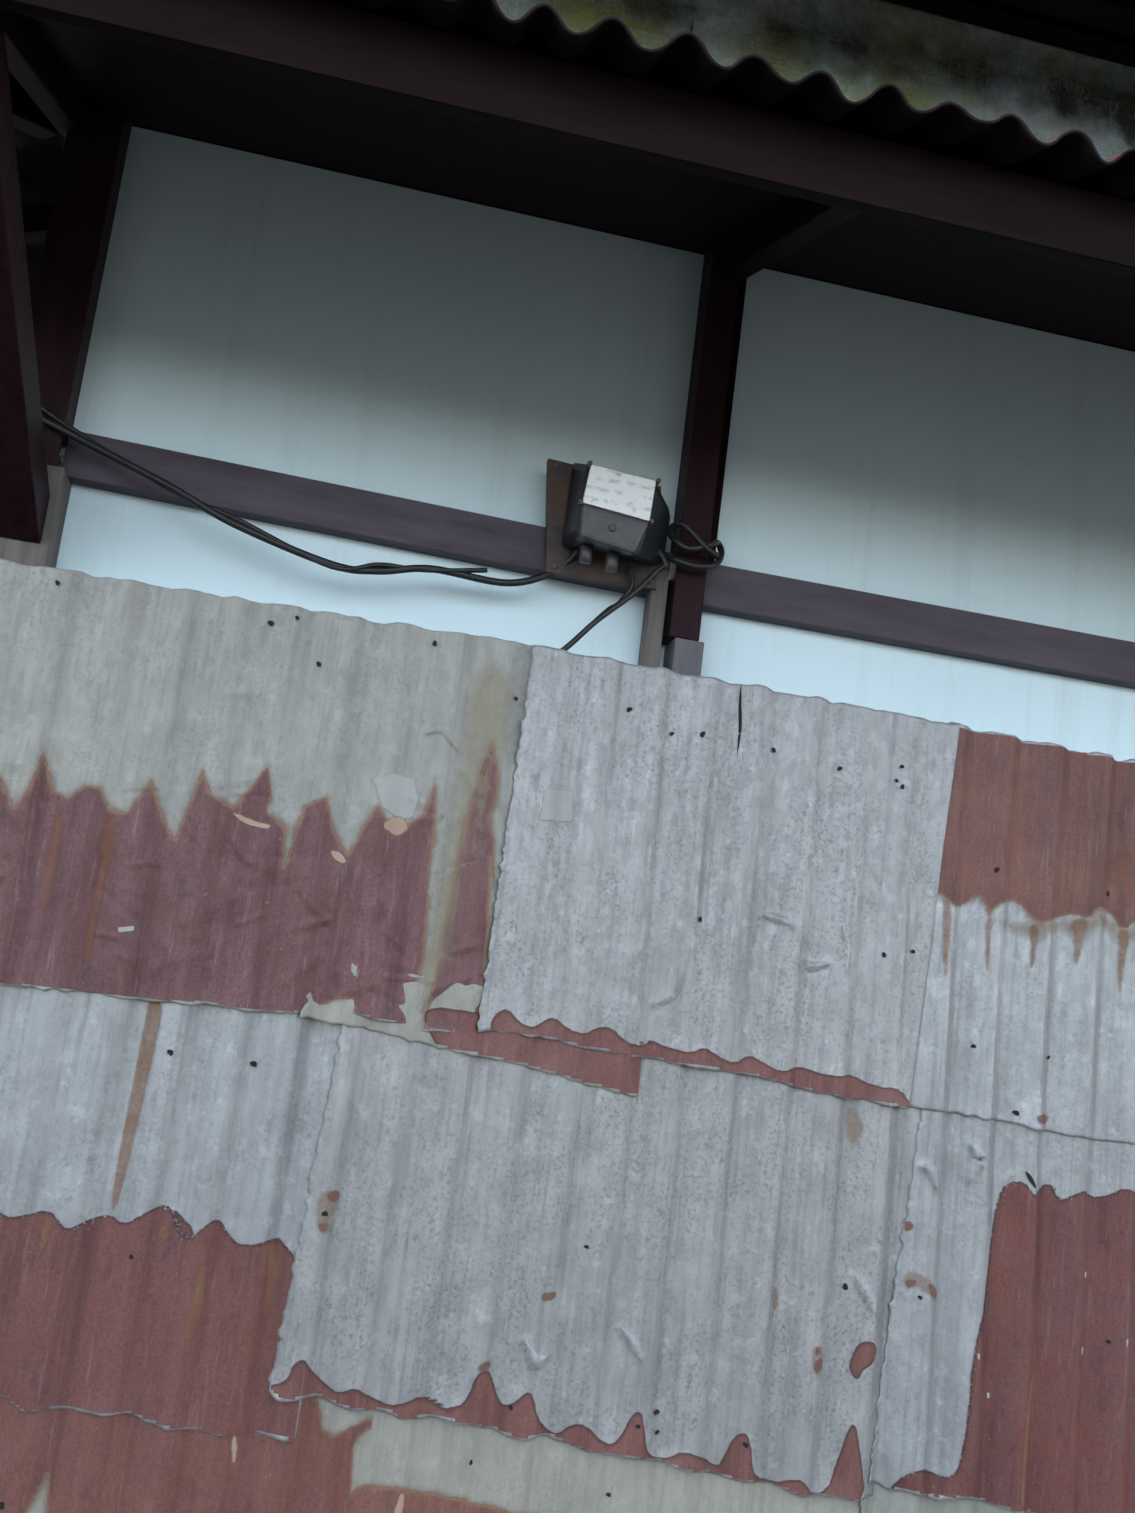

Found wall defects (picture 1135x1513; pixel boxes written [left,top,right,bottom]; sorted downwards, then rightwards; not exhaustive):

water stain [772,23,1135,147]
peeling [0,744,910,1107]
corrosion [1031,926,1041,964]
corrosion [1119,931,1127,986]
corrosion [115,1002,161,1194]
peeling [0,1205,864,1513]
peeling [891,1182,1135,1513]